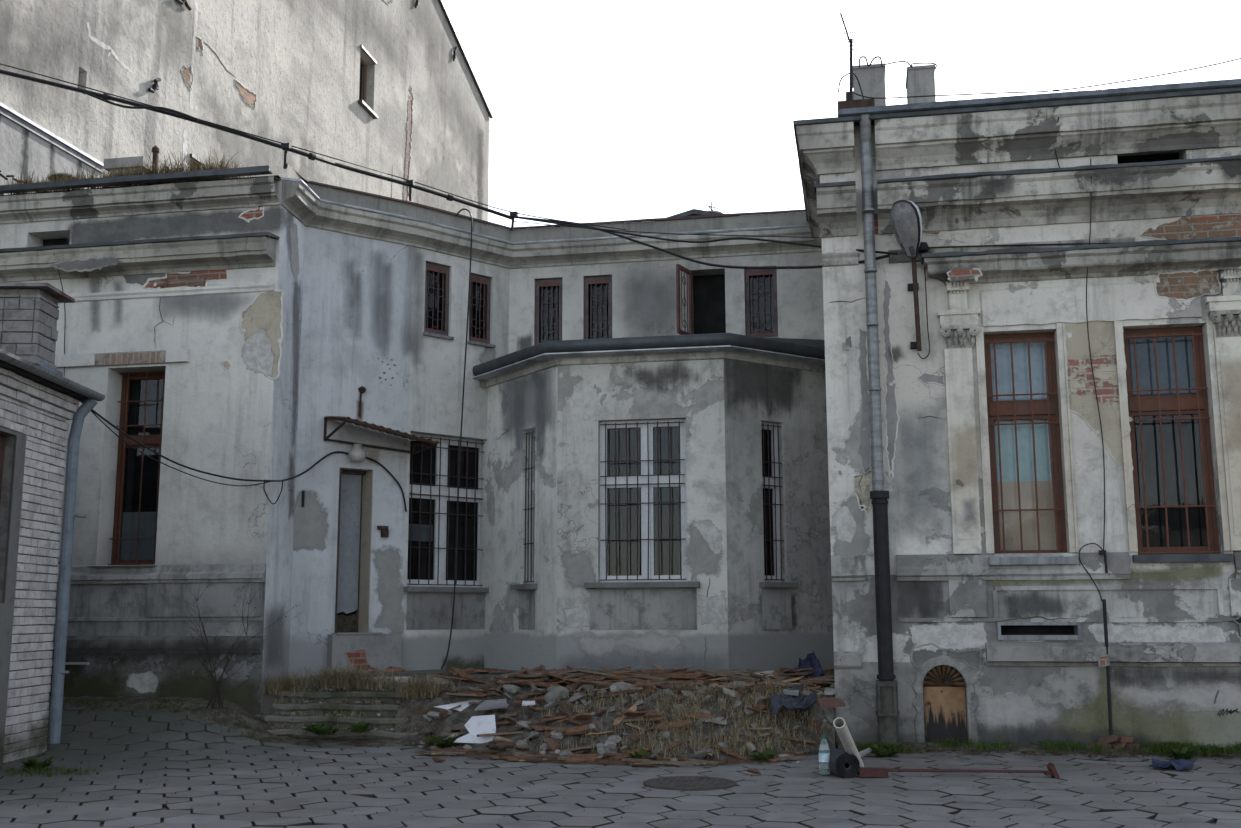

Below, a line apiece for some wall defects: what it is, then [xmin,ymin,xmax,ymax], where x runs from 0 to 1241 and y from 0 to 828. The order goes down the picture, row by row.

flaking render [234,79,257,110]
spalling [1139,213,1241,240]
spalling [1154,269,1221,306]
peeling [220,289,284,380]
peeling [1065,320,1134,471]
peeling [125,671,158,694]